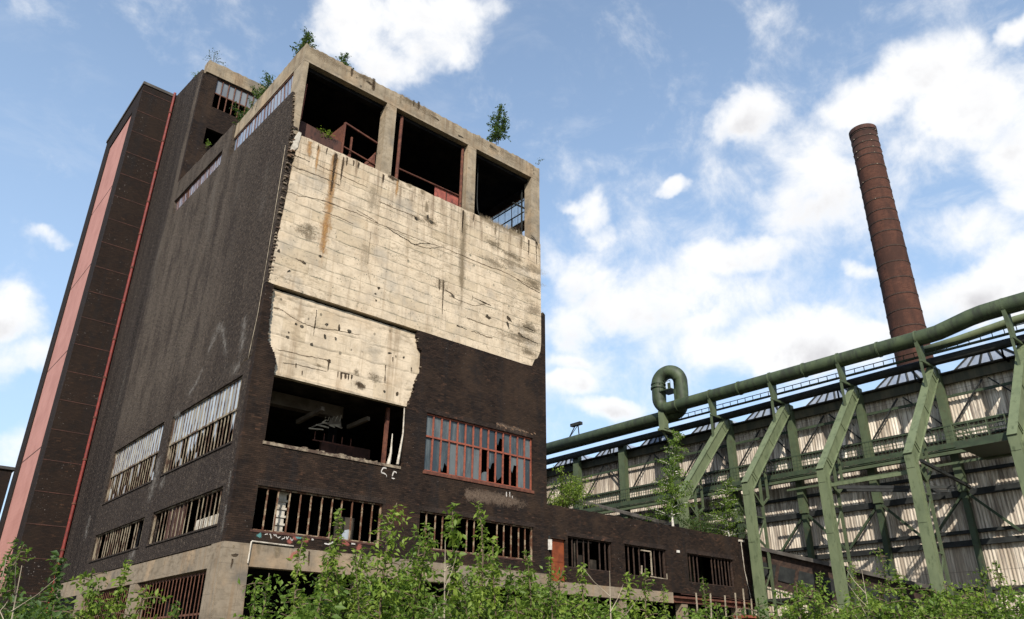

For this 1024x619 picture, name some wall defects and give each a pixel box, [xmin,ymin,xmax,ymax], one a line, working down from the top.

spalling [268,95,301,312]
corrosion [322,153,338,252]
crack [284,152,540,293]
crack [273,307,358,371]